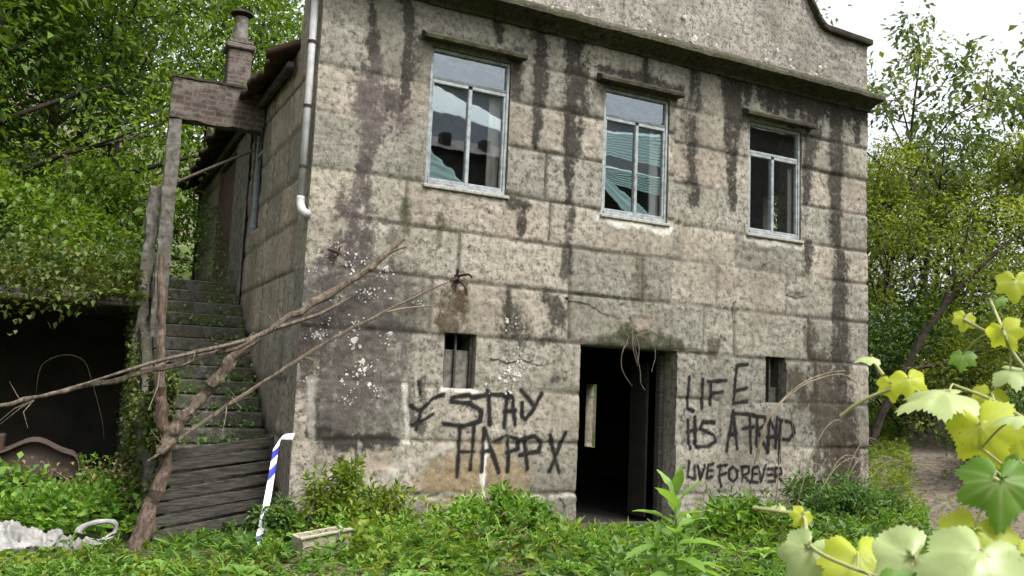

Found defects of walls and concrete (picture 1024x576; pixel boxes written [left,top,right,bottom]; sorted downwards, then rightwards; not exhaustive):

damp [298,0,426,490]
damp [500,289,567,352]
damp [559,38,702,277]
damp [708,338,721,359]
damp [718,76,868,492]